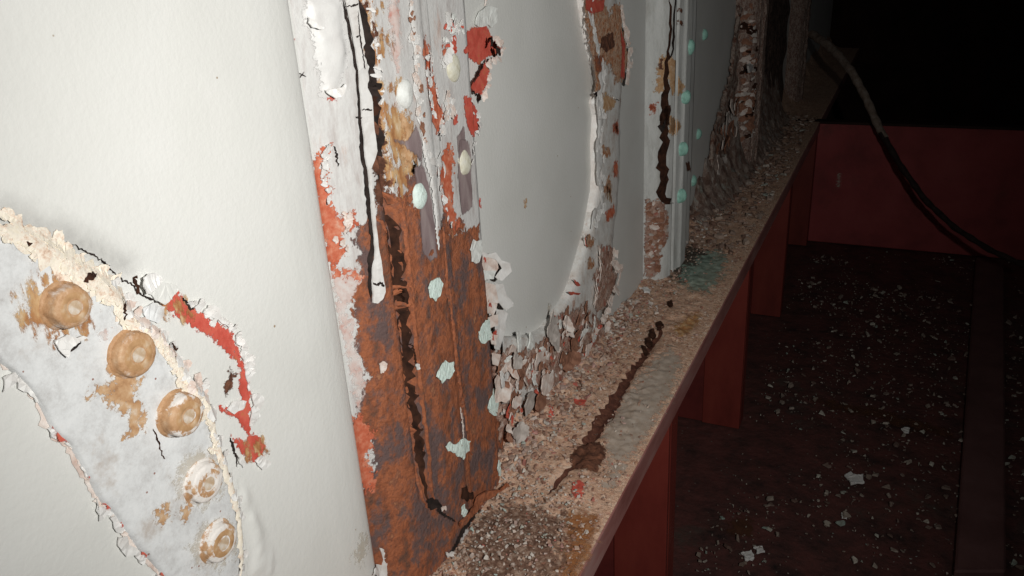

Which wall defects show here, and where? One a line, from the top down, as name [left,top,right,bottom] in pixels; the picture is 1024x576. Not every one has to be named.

peeling [408,0,507,235]
corrosion [584,0,633,113]
crack [656,0,676,204]
corrosion [10,270,95,350]
corrosion [85,364,148,441]
peeling [0,207,271,576]
peeling [313,0,386,495]
crack [343,0,480,558]
corrosion [345,76,623,576]
peeling [482,252,514,366]
corrosion [643,197,669,279]